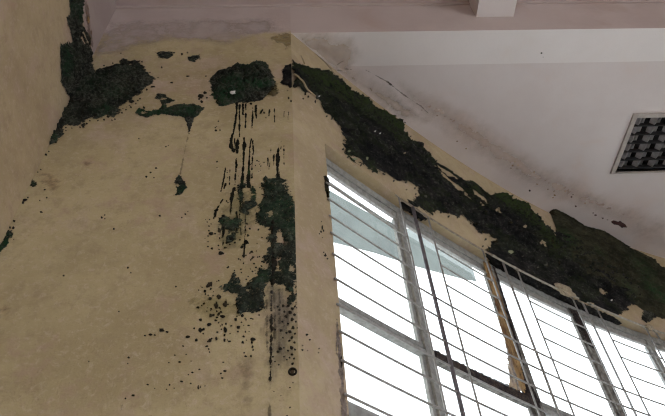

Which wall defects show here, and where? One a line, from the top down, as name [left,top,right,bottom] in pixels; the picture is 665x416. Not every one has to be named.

water stain [186,133,308,382]